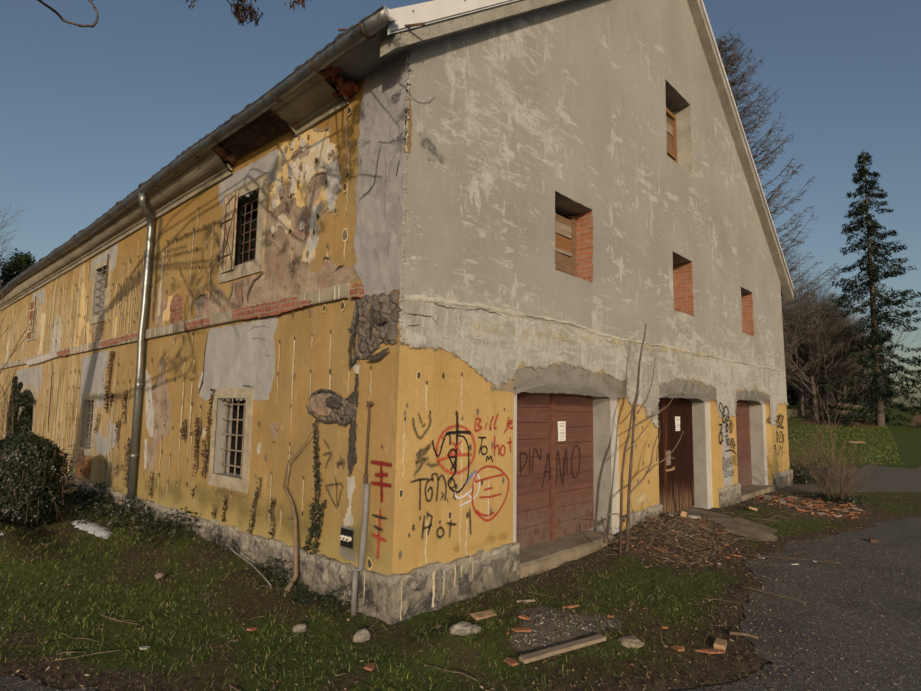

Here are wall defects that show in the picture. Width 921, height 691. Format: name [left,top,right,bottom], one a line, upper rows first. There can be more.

crack [359,140,400,200]
leakage [149,219,172,338]
flaking render [155,105,402,426]
flaking render [95,361,132,480]
flaking render [144,355,206,498]